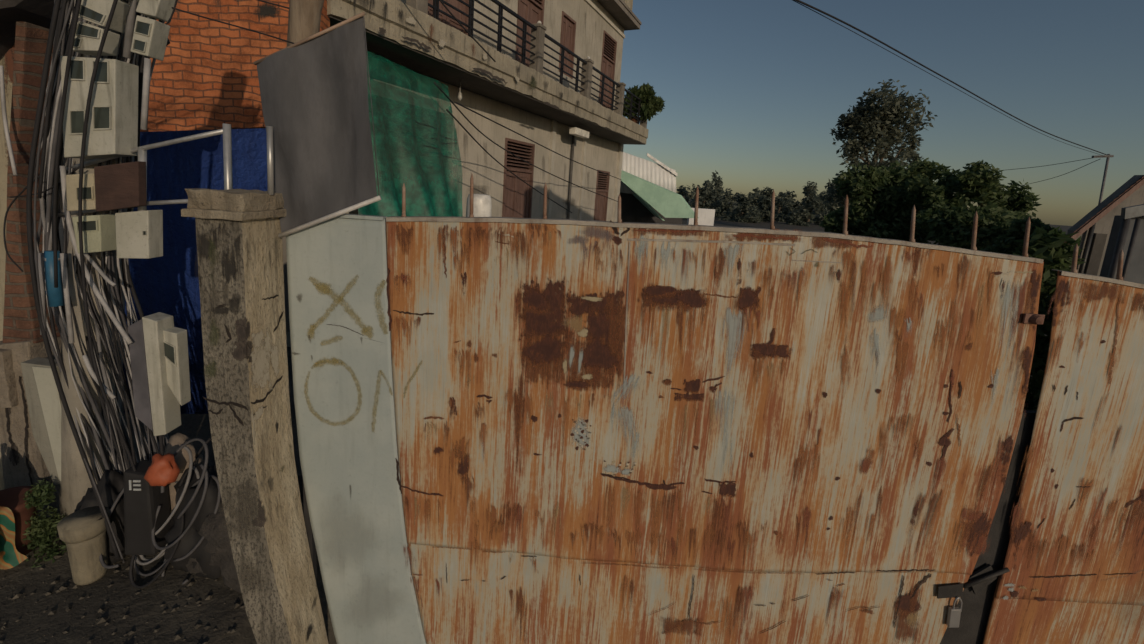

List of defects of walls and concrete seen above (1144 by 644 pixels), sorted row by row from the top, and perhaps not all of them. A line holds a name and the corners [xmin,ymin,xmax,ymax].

rust [437,223,561,286]
rust [634,228,710,236]
crack [218,304,232,343]
rust [386,268,407,331]
rust [638,229,932,383]
rust [934,255,1144,425]
crack [203,376,282,426]
rust [424,278,626,561]
rust [646,371,725,432]
rust [571,479,783,563]
rust [1011,479,1144,570]
rust [893,574,932,644]